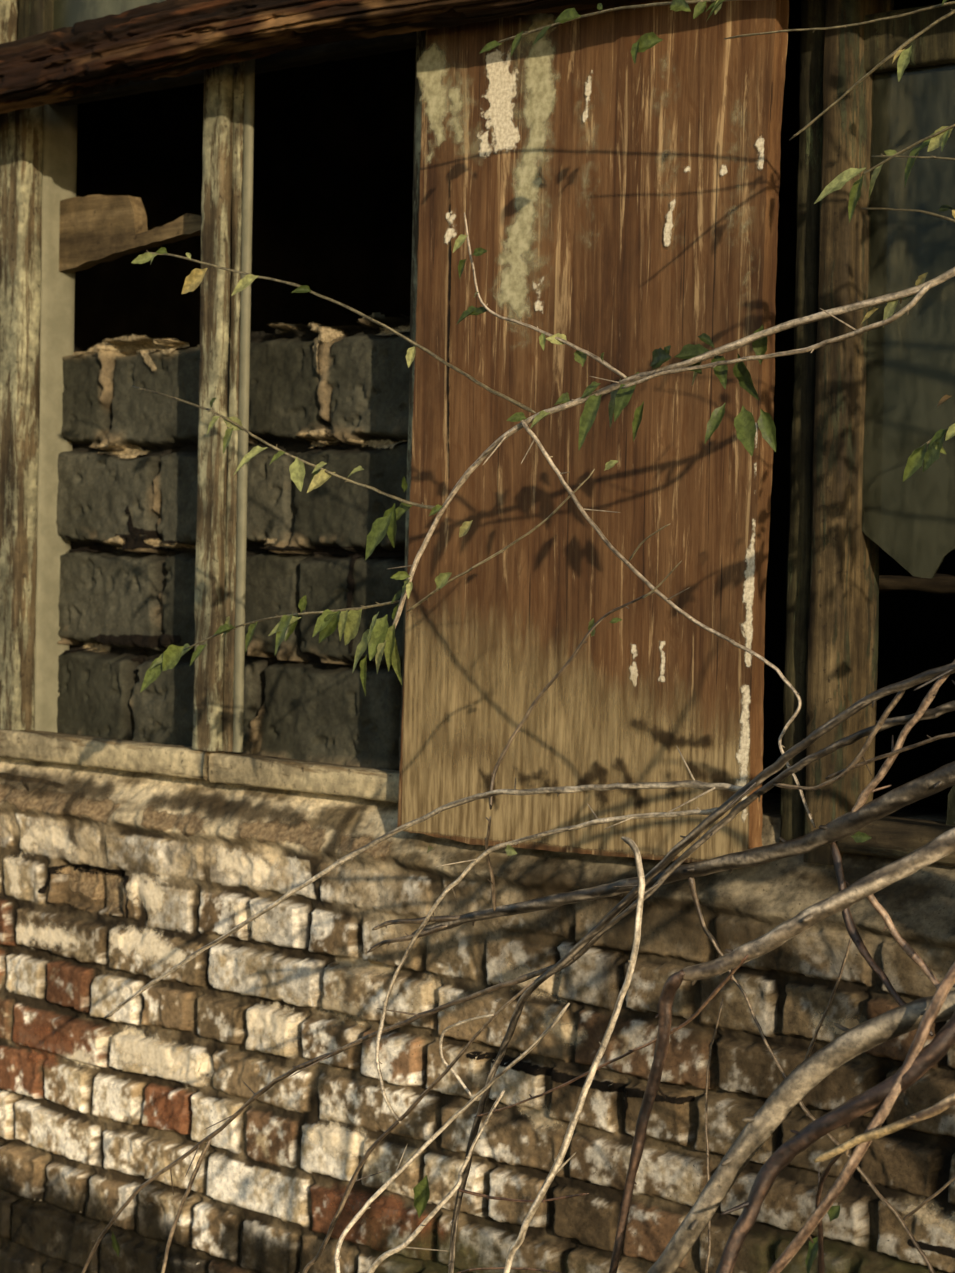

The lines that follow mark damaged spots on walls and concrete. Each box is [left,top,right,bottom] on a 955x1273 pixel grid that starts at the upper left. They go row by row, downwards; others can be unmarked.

peeling [417,43,463,160]
peeling [477,13,558,318]
peeling [755,138,764,169]
peeling [444,211,457,244]
peeling [742,519,756,667]
leakage [0,769,113,845]
leakage [149,793,305,824]
leakage [324,809,354,857]
leakage [402,614,750,860]
peeling [735,685,751,821]
leakage [488,863,764,1018]
leakage [0,1168,358,1273]